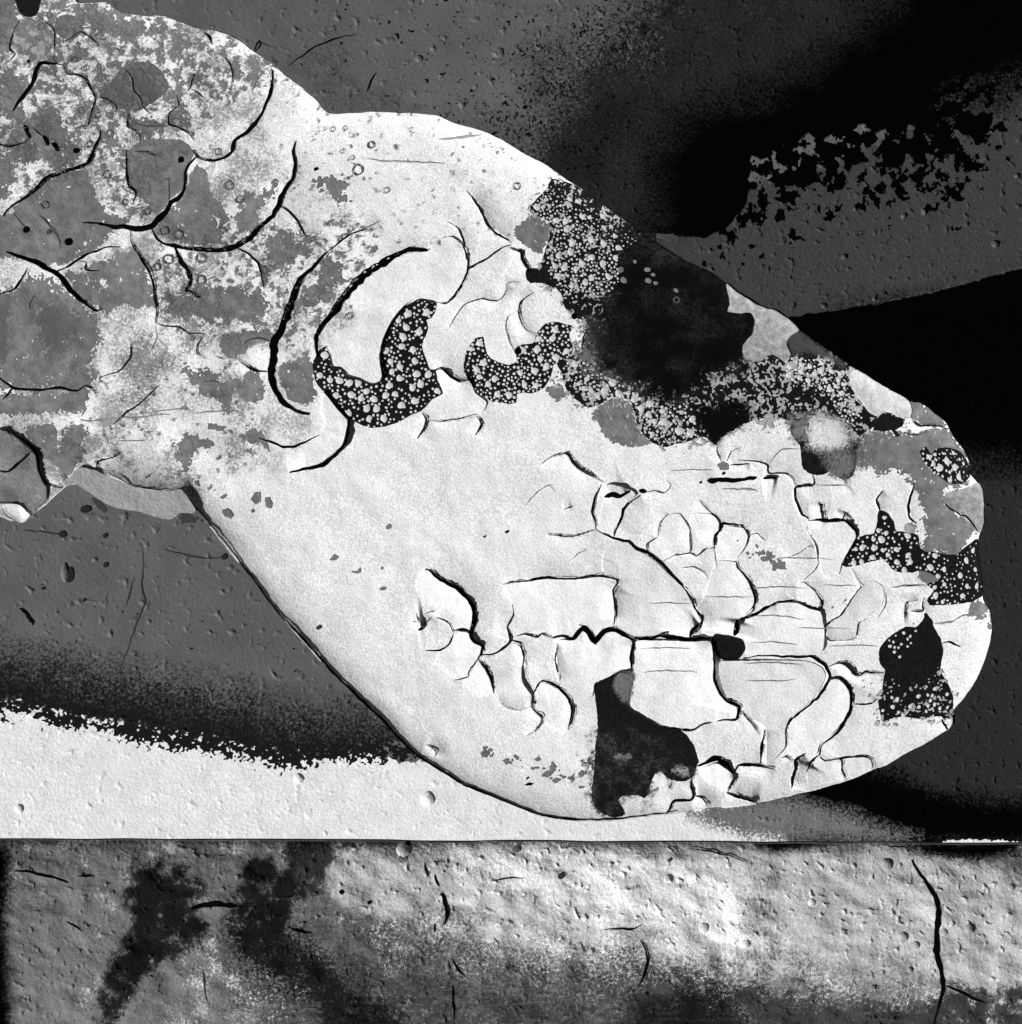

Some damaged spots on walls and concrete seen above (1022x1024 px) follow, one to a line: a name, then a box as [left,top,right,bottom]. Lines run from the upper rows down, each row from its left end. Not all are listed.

peeling [0,428,47,522]
peeling [66,467,196,519]
crack [0,16,378,473]
crack [314,247,428,357]
crack [437,190,534,351]
peeling [287,174,912,484]
peeling [416,485,872,818]
crack [411,447,972,815]
water stain [538,0,1022,842]
peeling [808,447,984,729]
water stain [0,840,1022,1024]
crack [889,846,986,1024]